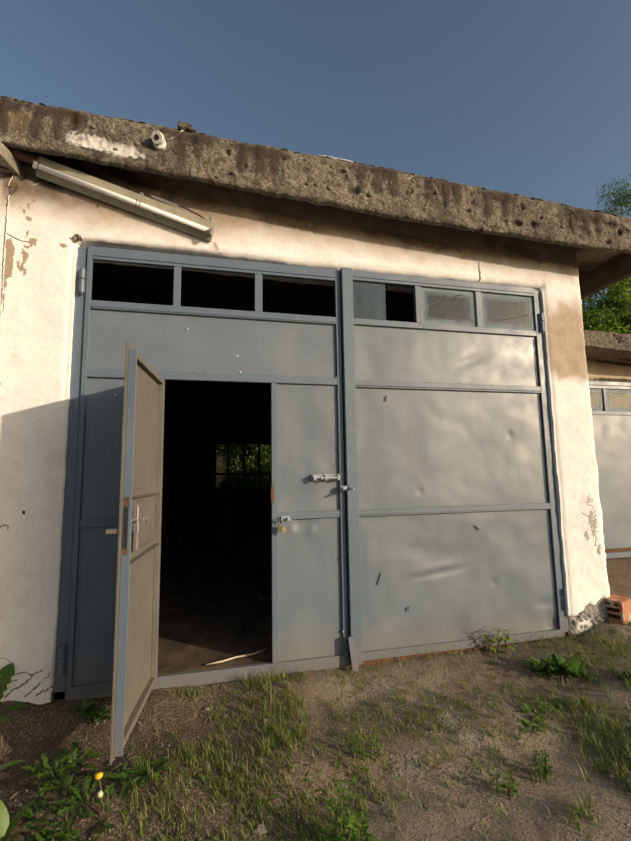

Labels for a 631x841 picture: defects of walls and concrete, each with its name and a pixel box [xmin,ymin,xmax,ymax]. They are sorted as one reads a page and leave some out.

damp [233,142,282,174]
damp [359,164,398,196]
damp [420,176,462,206]
damp [479,190,518,215]
damp [262,211,317,229]
crack [0,173,39,333]
peeling [2,231,38,301]
damp [398,237,448,251]
spalling [568,597,610,637]
crack [0,656,53,698]